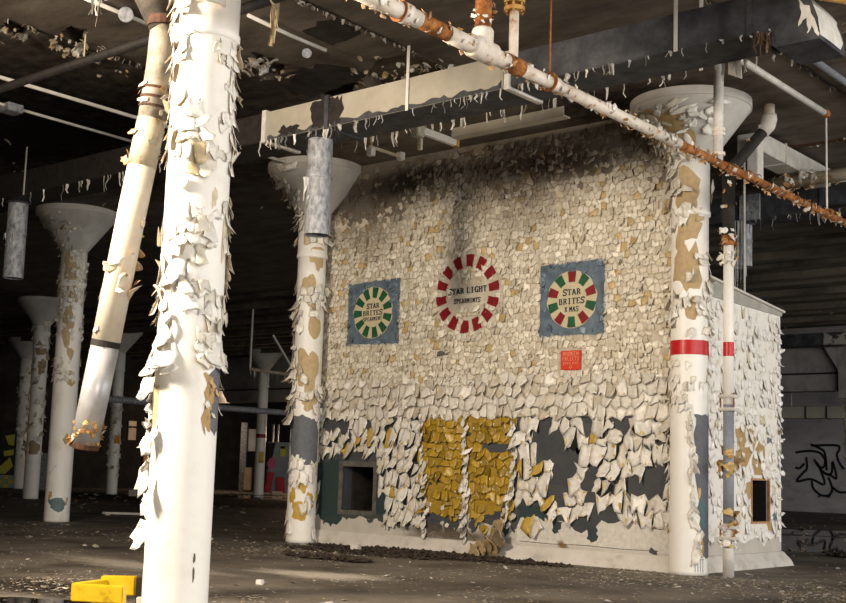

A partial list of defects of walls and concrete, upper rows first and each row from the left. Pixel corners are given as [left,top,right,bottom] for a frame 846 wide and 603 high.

peeling [13,210,98,458]
peeling [48,491,68,512]
peeling [63,394,124,476]
peeling [103,249,145,300]
peeling [130,0,454,550]
peeling [269,54,846,567]